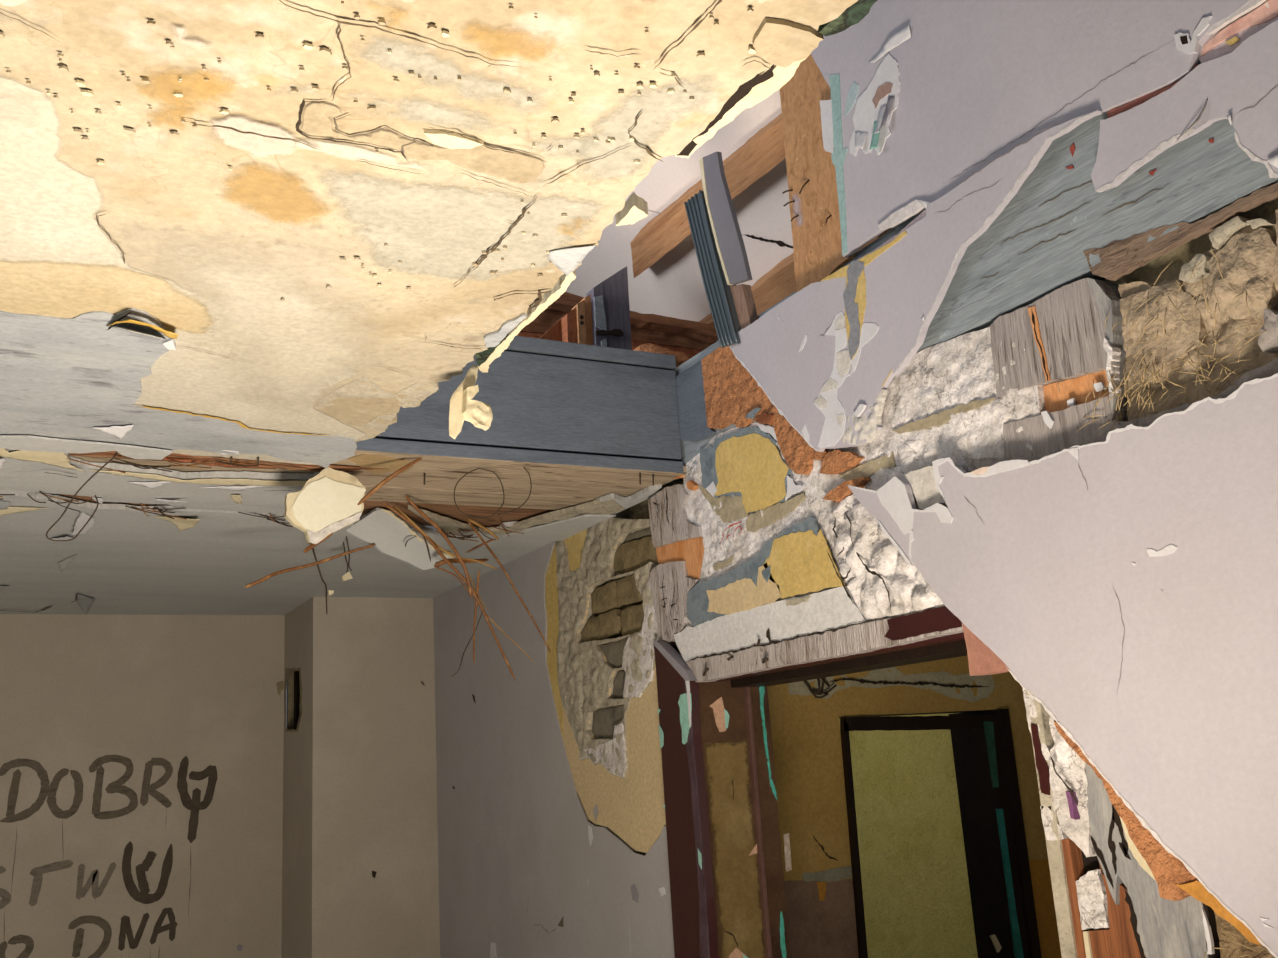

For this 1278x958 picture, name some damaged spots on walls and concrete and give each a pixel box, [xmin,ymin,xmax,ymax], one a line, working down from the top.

leakage [144,73,234,126]
crack [185,121,316,149]
crack [279,0,521,102]
crack [583,0,722,88]
peeling [0,69,438,441]
leakage [229,167,328,223]
leakage [322,172,602,280]
crack [429,111,663,287]
peeling [686,424,845,626]
spalling [545,517,675,853]
peeling [1022,687,1054,762]
peeling [1040,806,1069,841]